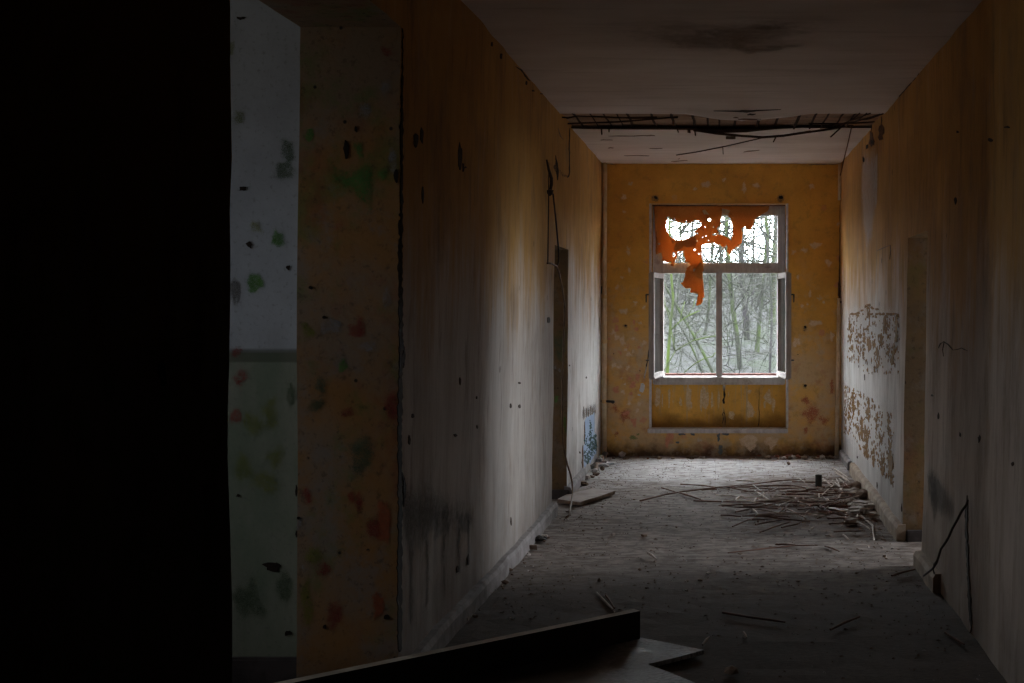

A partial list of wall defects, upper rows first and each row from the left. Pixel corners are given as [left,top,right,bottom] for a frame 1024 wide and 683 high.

peeling [792,227,906,488]